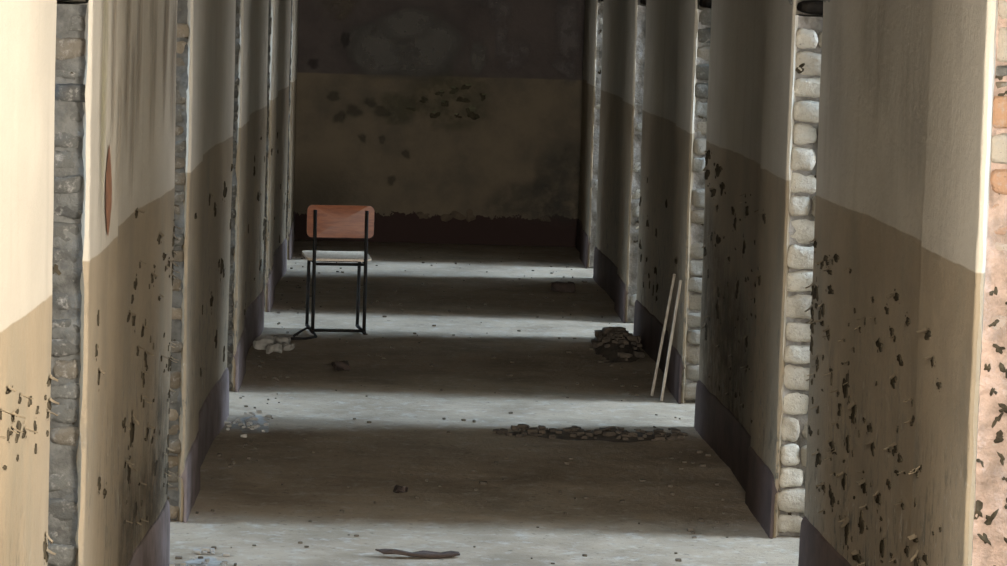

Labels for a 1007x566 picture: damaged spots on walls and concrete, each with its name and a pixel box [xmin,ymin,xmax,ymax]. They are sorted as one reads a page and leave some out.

flaking render [0,0,87,566]
flaking render [122,0,197,526]
flaking render [209,0,293,391]
flaking render [684,0,766,409]
flaking render [778,0,932,566]